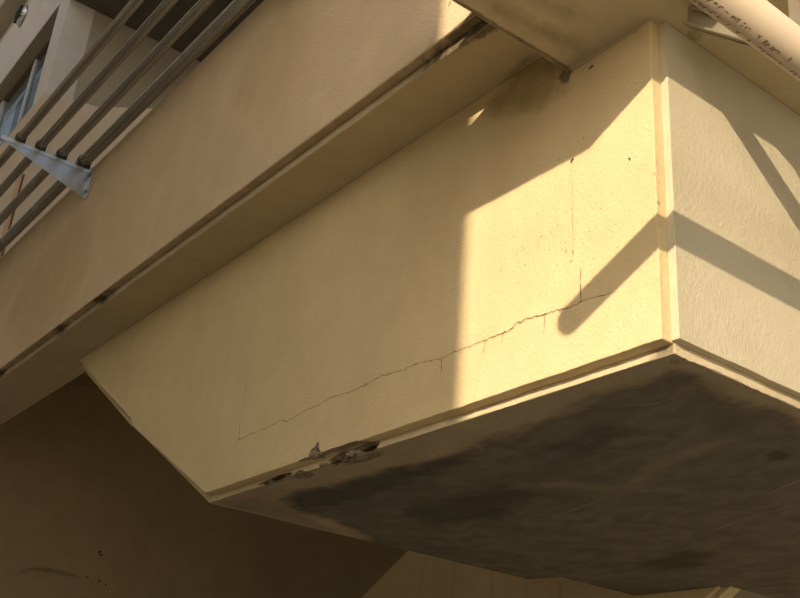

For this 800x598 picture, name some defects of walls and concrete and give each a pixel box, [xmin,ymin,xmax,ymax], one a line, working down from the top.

crack [234,158,610,450]
spalling [250,440,384,490]
damp [289,375,800,598]